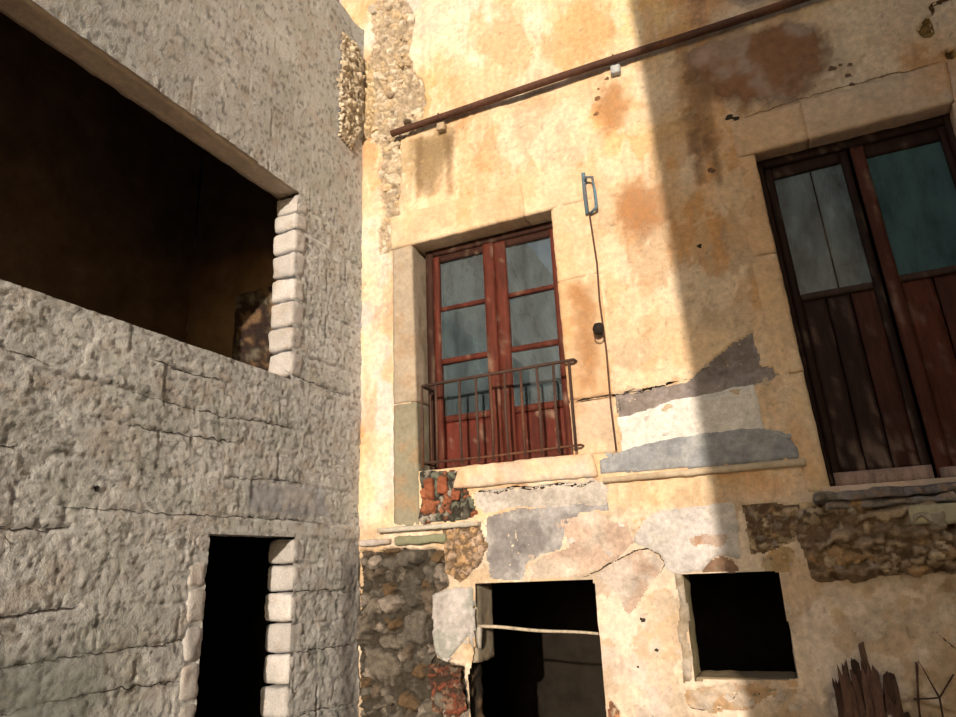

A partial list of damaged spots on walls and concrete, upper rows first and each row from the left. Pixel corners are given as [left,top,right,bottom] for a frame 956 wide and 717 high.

flaking render [918,0,948,38]
flaking render [336,0,427,255]
water stain [687,21,830,171]
crack [734,60,945,121]
peeling [605,333,779,457]
flaking render [423,476,461,501]
peeling [473,480,634,580]
flaking render [702,556,739,573]
flaking render [742,502,800,572]
flaking render [674,572,803,714]